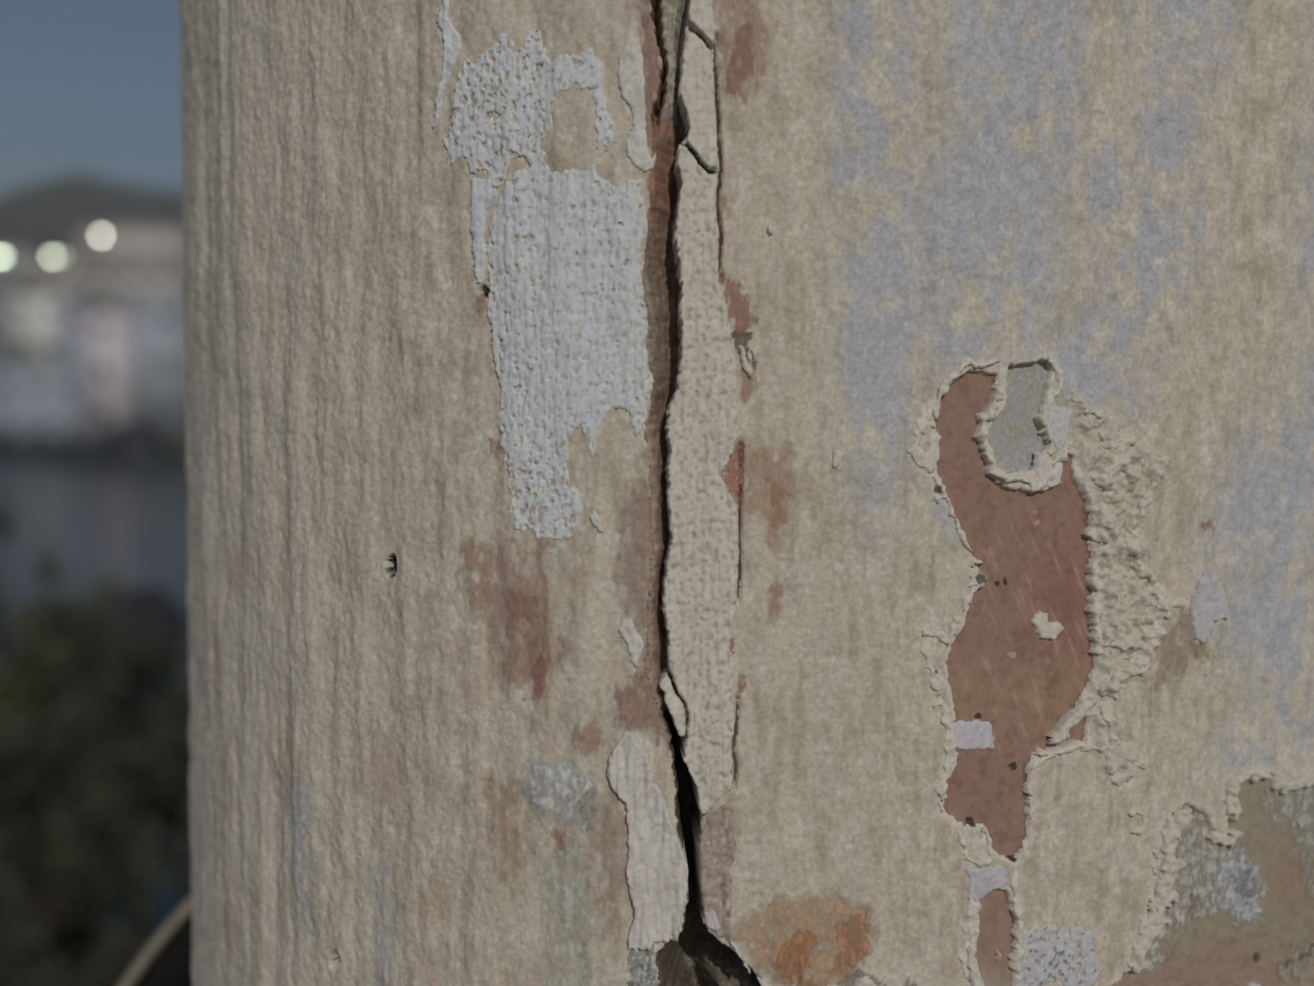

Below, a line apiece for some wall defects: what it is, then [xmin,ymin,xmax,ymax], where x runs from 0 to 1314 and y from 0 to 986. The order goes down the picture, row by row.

peeling [432,0,771,986]
crack [642,0,723,951]
crack [731,701,739,783]
crack [736,448,744,598]
peeling [906,357,1104,986]
peeling [1188,567,1228,644]
peeling [1112,766,1314,986]